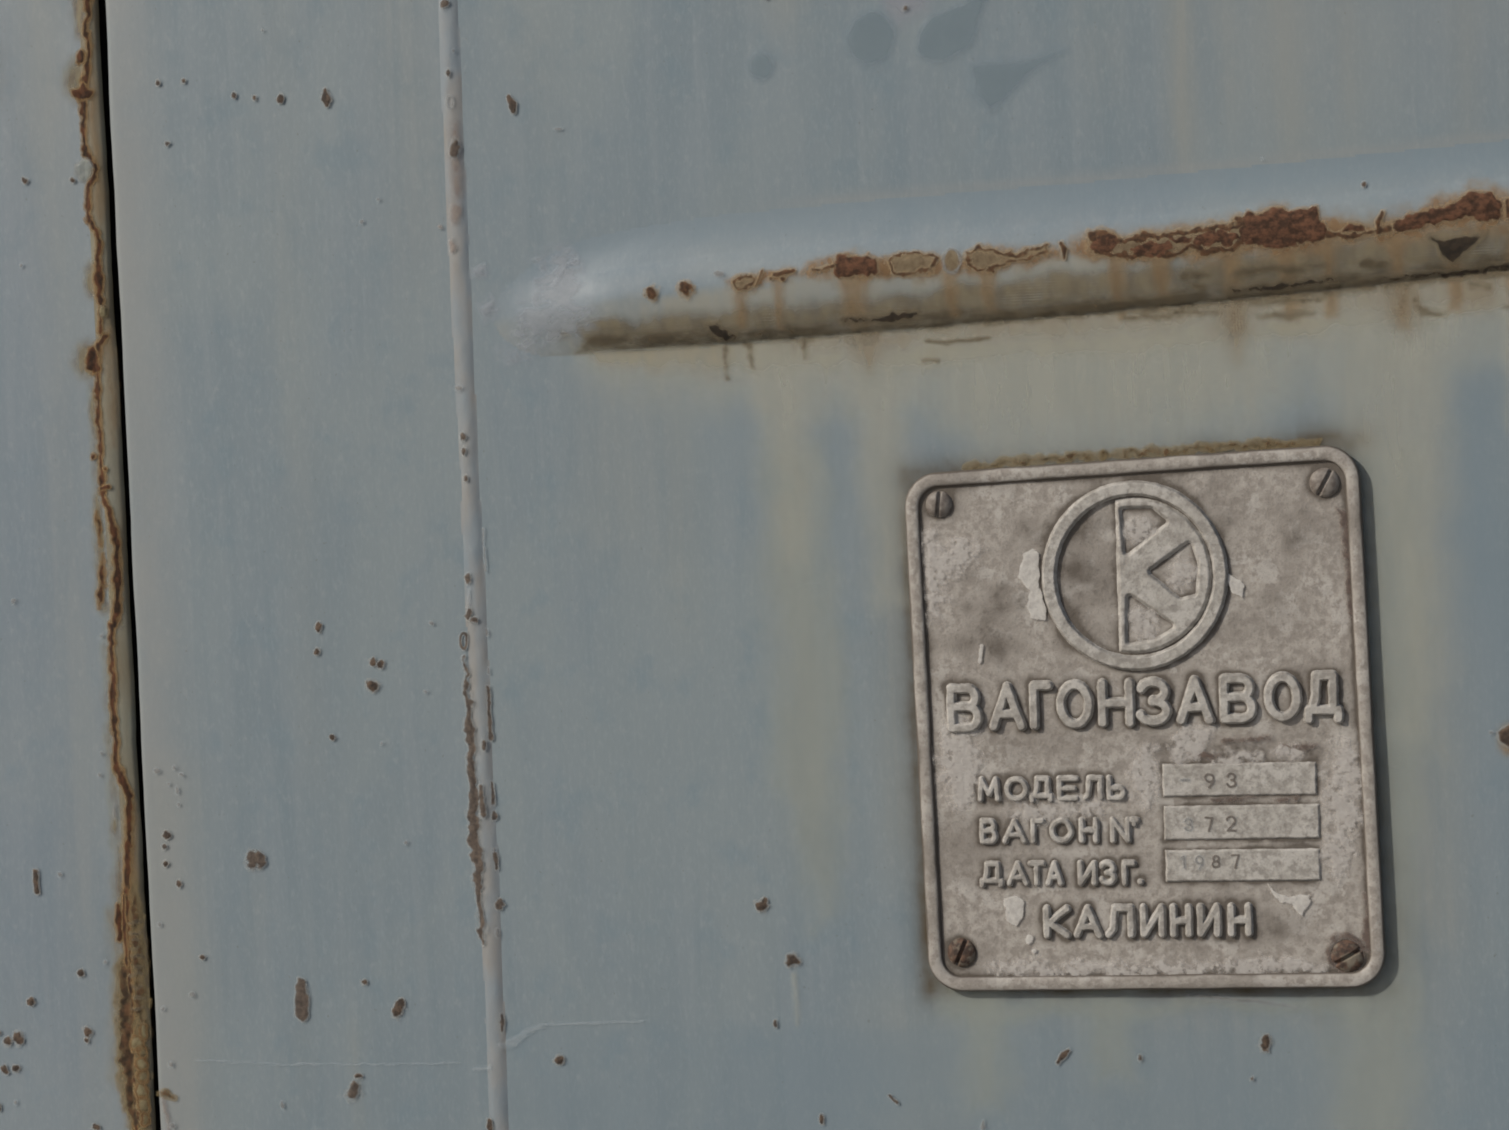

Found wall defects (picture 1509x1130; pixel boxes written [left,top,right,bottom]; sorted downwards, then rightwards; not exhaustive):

rust [73,0,83,38]
rust [321,88,331,107]
rust [558,188,1509,369]
rust [1489,725,1509,752]
rust [459,603,505,945]
rust [246,850,266,869]
rust [112,817,148,1130]
rust [295,978,309,1022]
rust [392,998,405,1017]
rust [3,1031,24,1046]